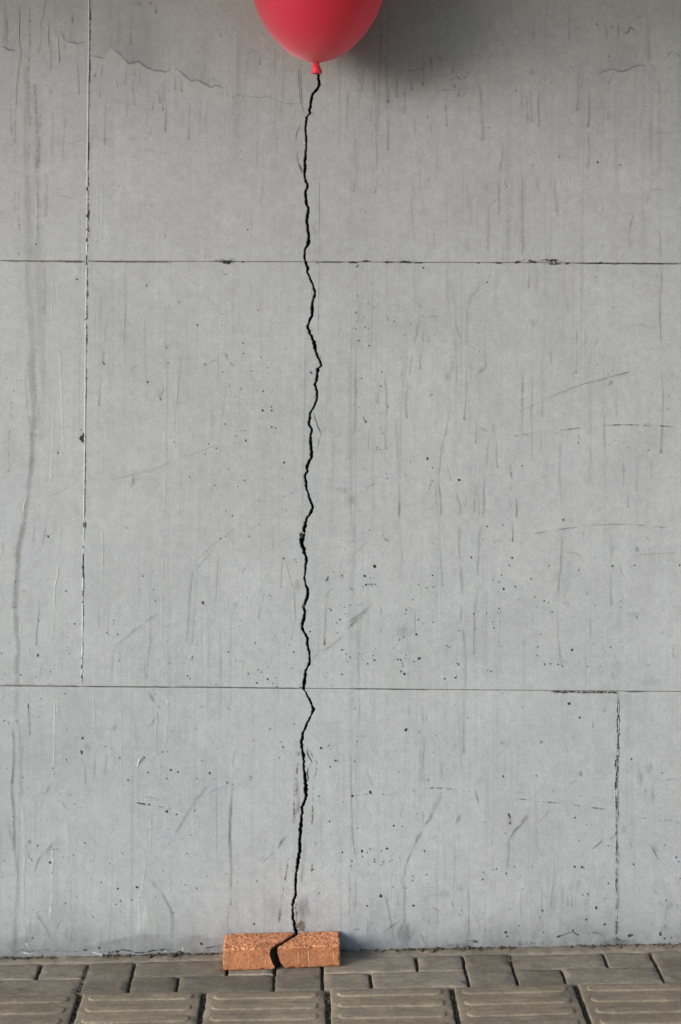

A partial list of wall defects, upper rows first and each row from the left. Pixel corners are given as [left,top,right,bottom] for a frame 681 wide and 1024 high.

crack [291,74,322,936]